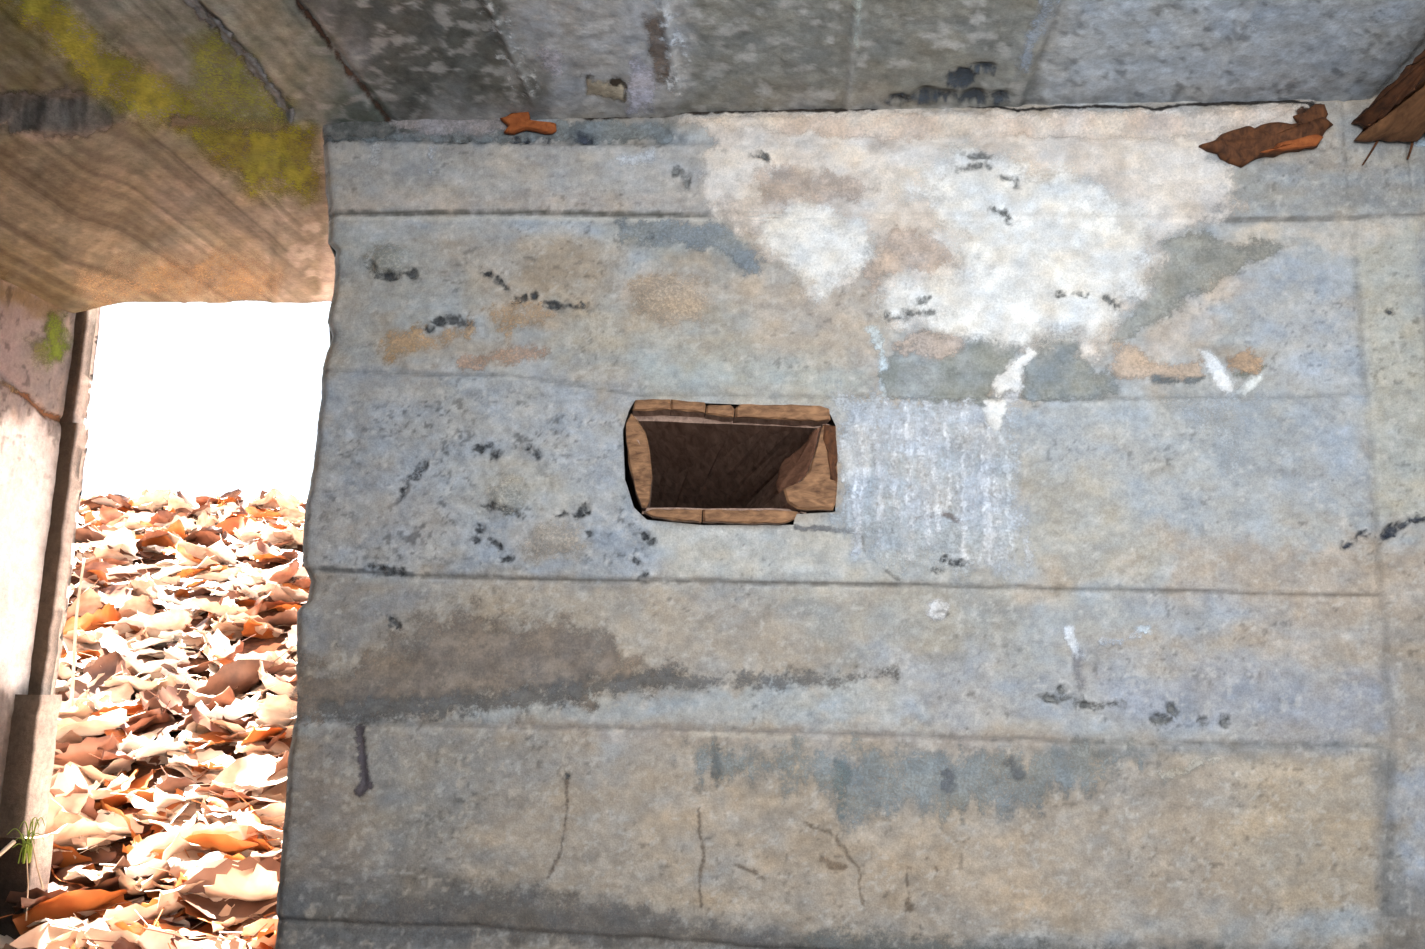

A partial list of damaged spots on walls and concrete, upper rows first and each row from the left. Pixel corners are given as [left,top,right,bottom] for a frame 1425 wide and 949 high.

damp [616,100,1315,565]
spalling [1380,517,1422,540]
damp [291,598,899,726]
damp [696,735,1143,832]